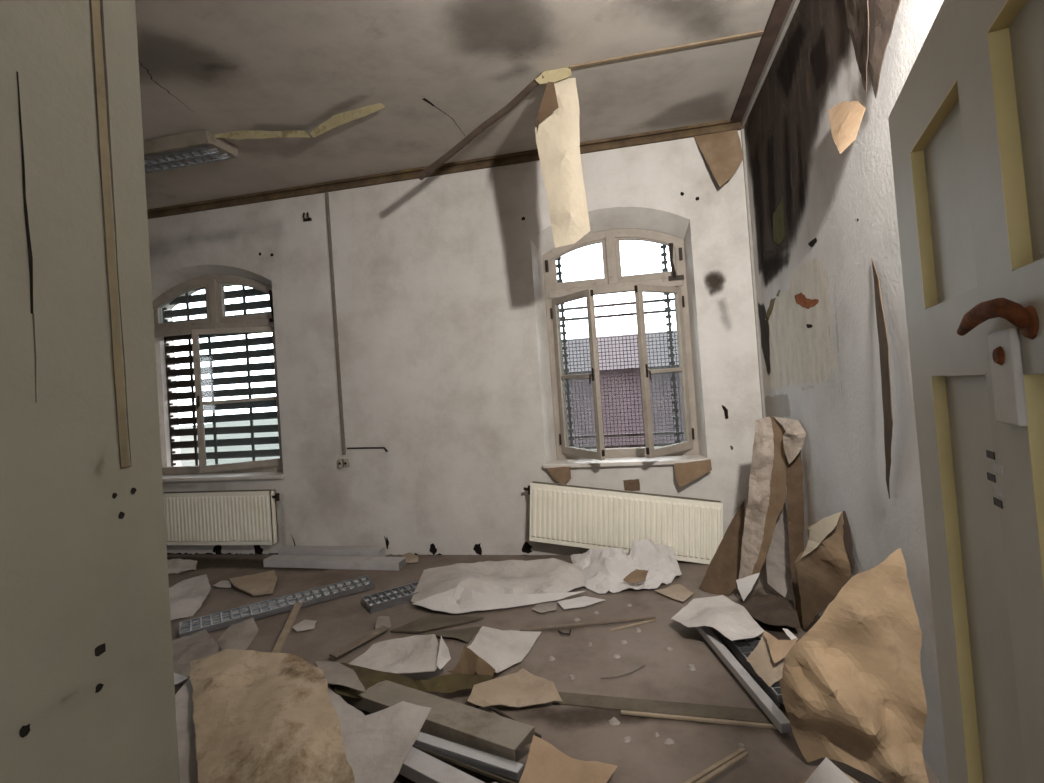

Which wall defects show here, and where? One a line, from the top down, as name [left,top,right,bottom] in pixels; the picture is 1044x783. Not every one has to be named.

peeling [535,67,572,84]
water stain [745,0,851,283]
crack [16,71,37,402]
water stain [706,273,724,294]
flaking render [762,237,844,412]